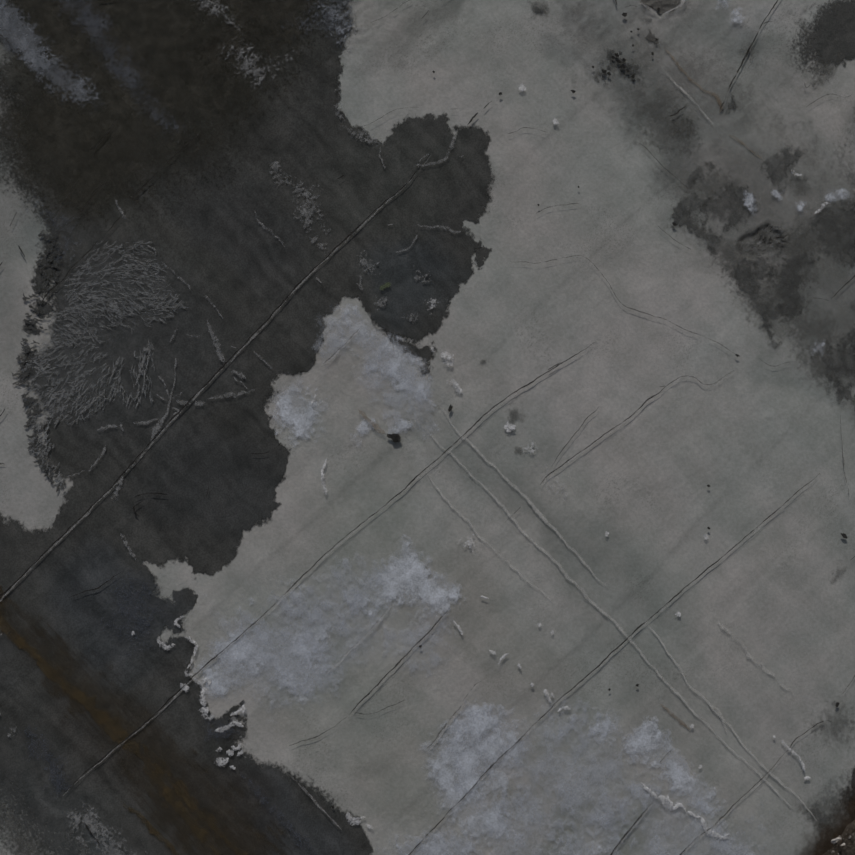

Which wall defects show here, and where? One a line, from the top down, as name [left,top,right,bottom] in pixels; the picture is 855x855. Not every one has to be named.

crack [720,0,778,108]
leakage [792,0,855,87]
crack [0,156,429,597]
leakage [0,0,495,855]
leakage [504,411,517,432]
crack [527,255,735,485]
leakage [672,163,855,401]
leakage [765,147,807,197]
crack [64,342,595,793]
crack [409,473,831,855]
leakage [429,705,521,855]
efflorescence [625,721,730,839]